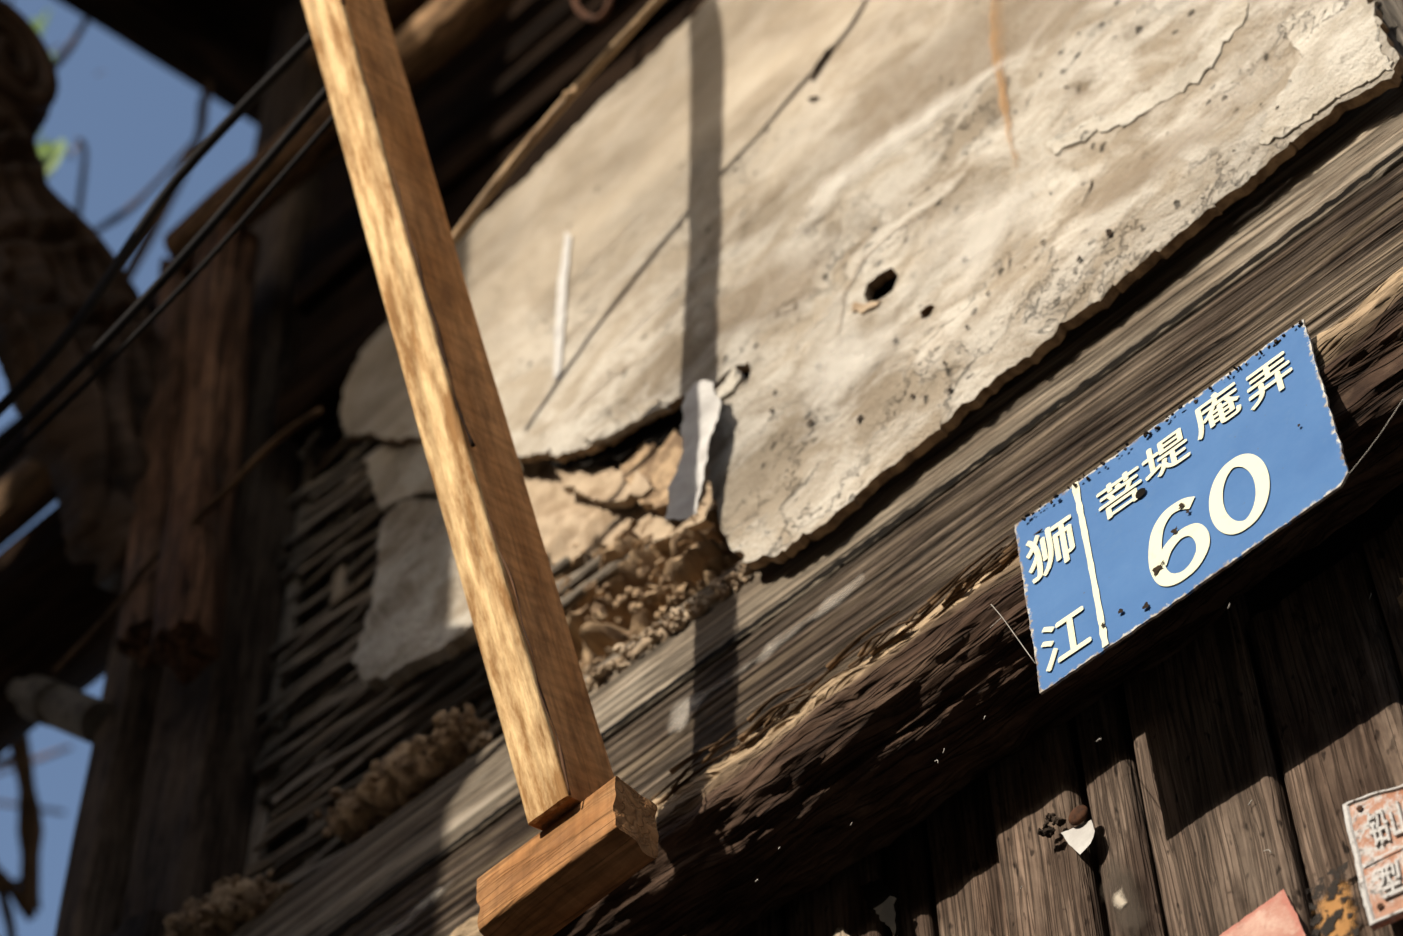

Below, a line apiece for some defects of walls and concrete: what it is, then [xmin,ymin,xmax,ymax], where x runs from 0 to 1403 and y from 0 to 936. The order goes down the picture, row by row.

peeling [714,367,745,403]
flaking render [520,398,744,676]